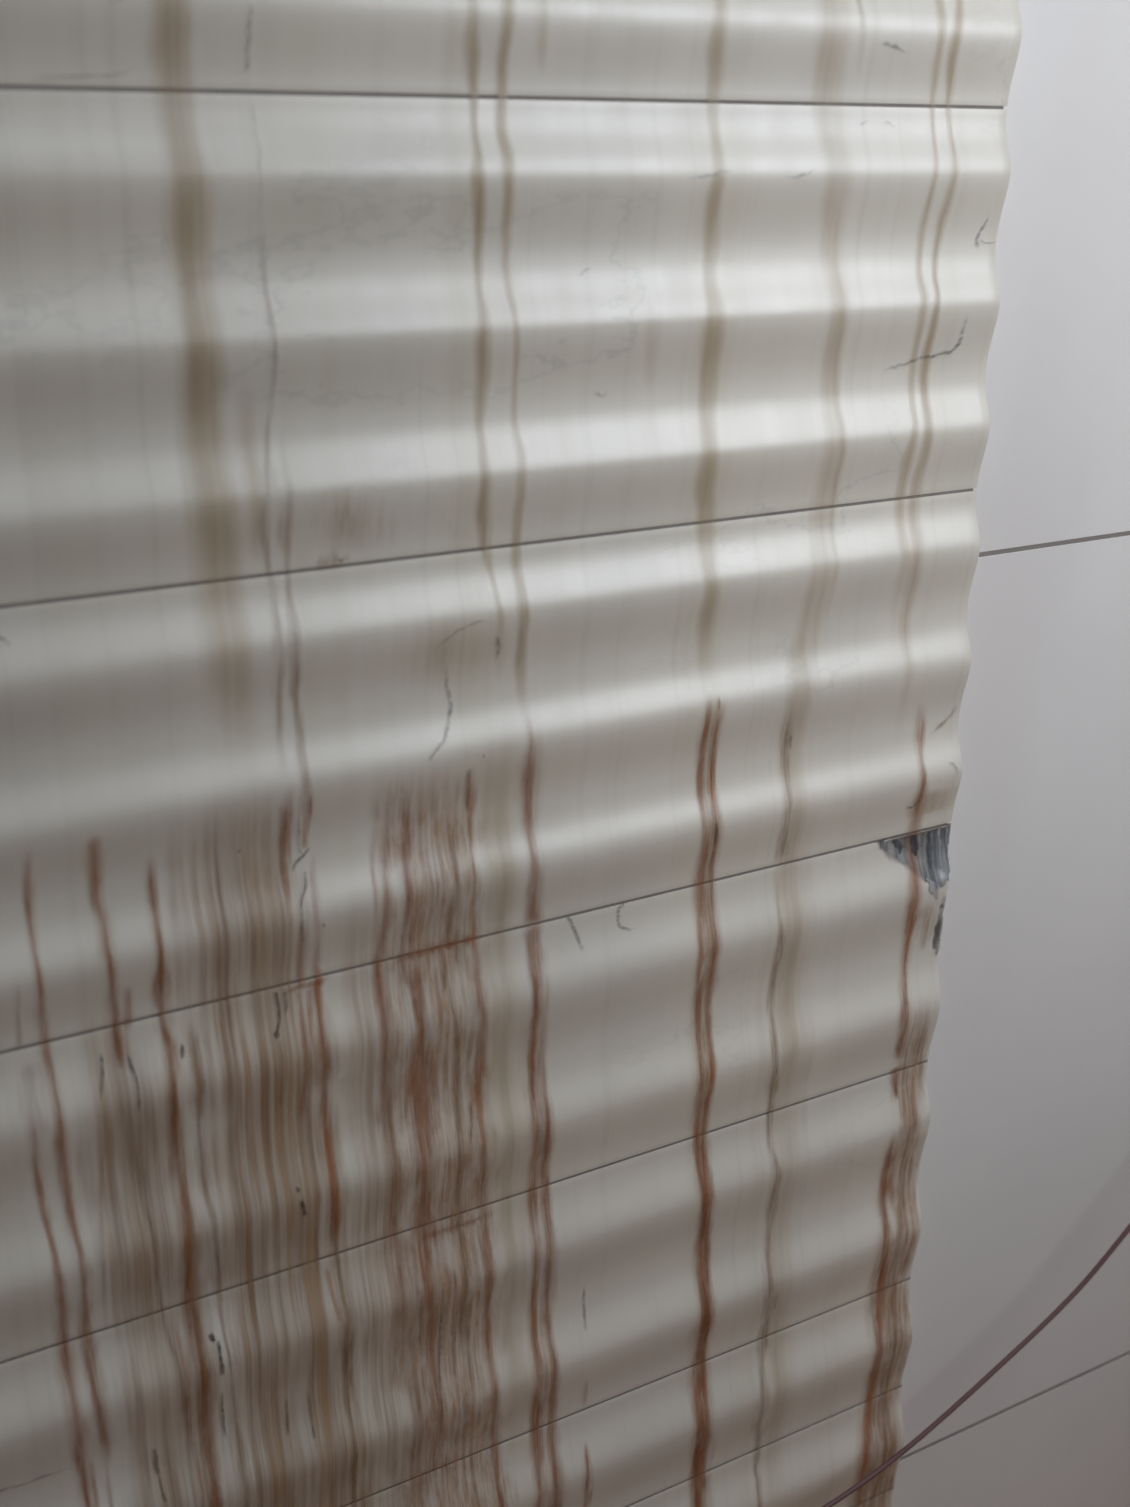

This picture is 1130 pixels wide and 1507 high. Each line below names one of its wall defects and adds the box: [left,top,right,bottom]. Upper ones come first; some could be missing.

rust [700,725,718,810]
spalling [878,823,951,948]
rust [165,1027,203,1148]
rust [304,978,325,1077]
rust [405,814,491,1507]
rust [696,1054,714,1333]
rust [859,1042,922,1507]
rust [202,1333,230,1427]